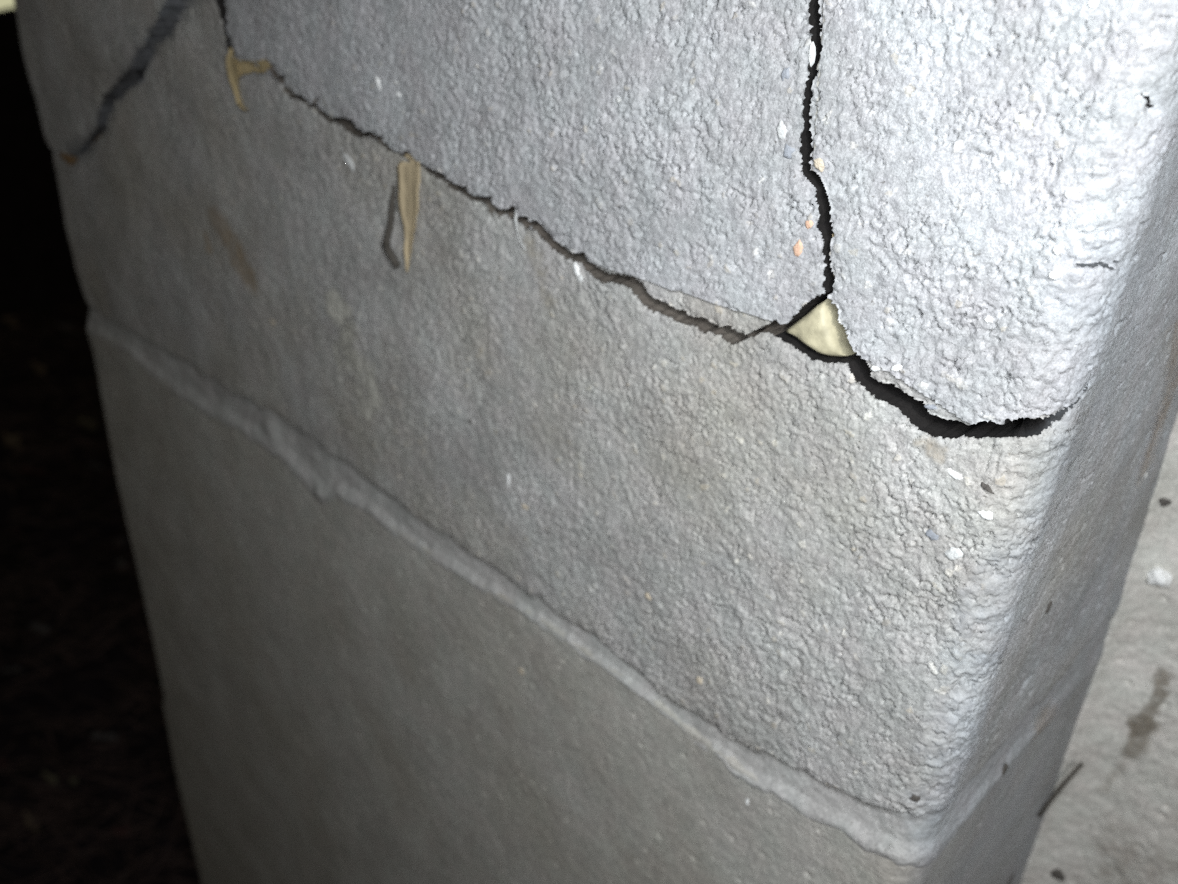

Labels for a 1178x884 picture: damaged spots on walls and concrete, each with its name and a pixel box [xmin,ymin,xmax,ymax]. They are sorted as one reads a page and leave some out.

crack [215,0,236,55]
crack [266,0,1088,439]